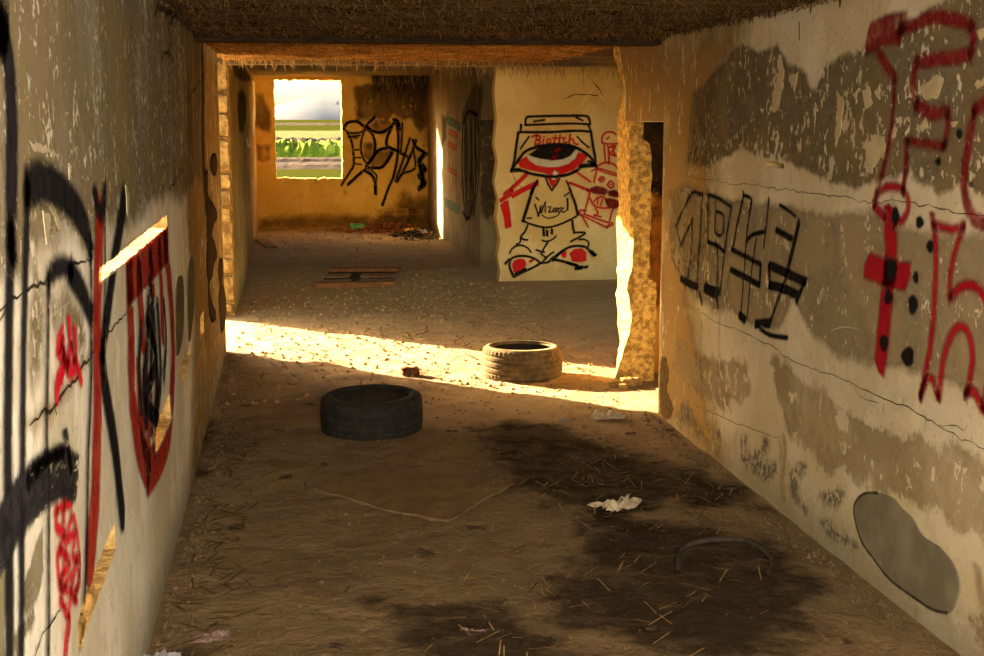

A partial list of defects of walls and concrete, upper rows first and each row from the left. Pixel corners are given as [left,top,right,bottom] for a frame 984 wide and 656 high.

peeling [687,0,984,195]
crack [686,175,984,216]
crack [0,259,93,321]
crack [683,302,984,449]